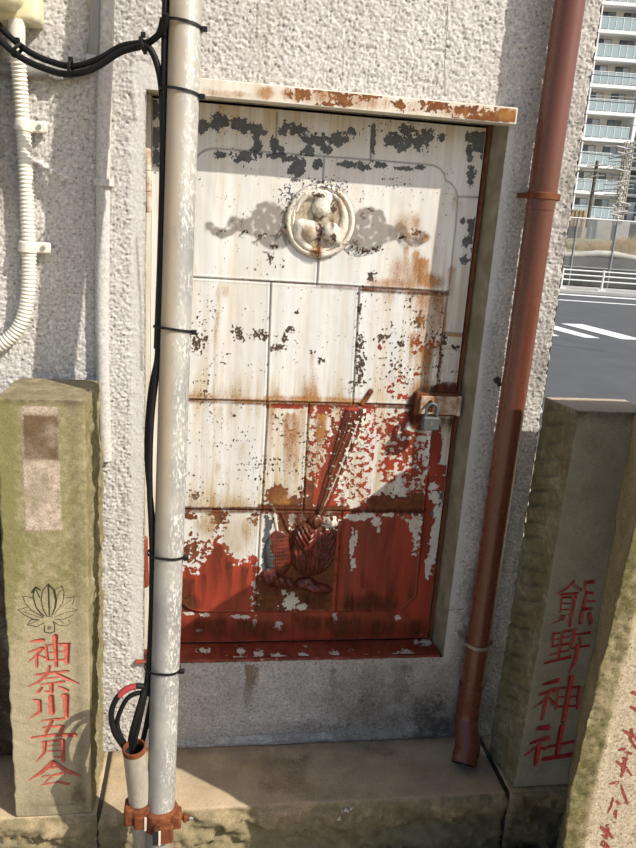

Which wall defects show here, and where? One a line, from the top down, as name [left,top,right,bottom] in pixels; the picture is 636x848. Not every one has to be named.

rust [464,108,516,123]
peeling [198,88,506,285]
rust [362,281,403,293]
rust [410,251,462,337]
rust [377,335,457,431]
rust [227,387,365,458]
peeling [180,271,460,658]
rust [185,493,354,531]
rust [182,580,197,610]